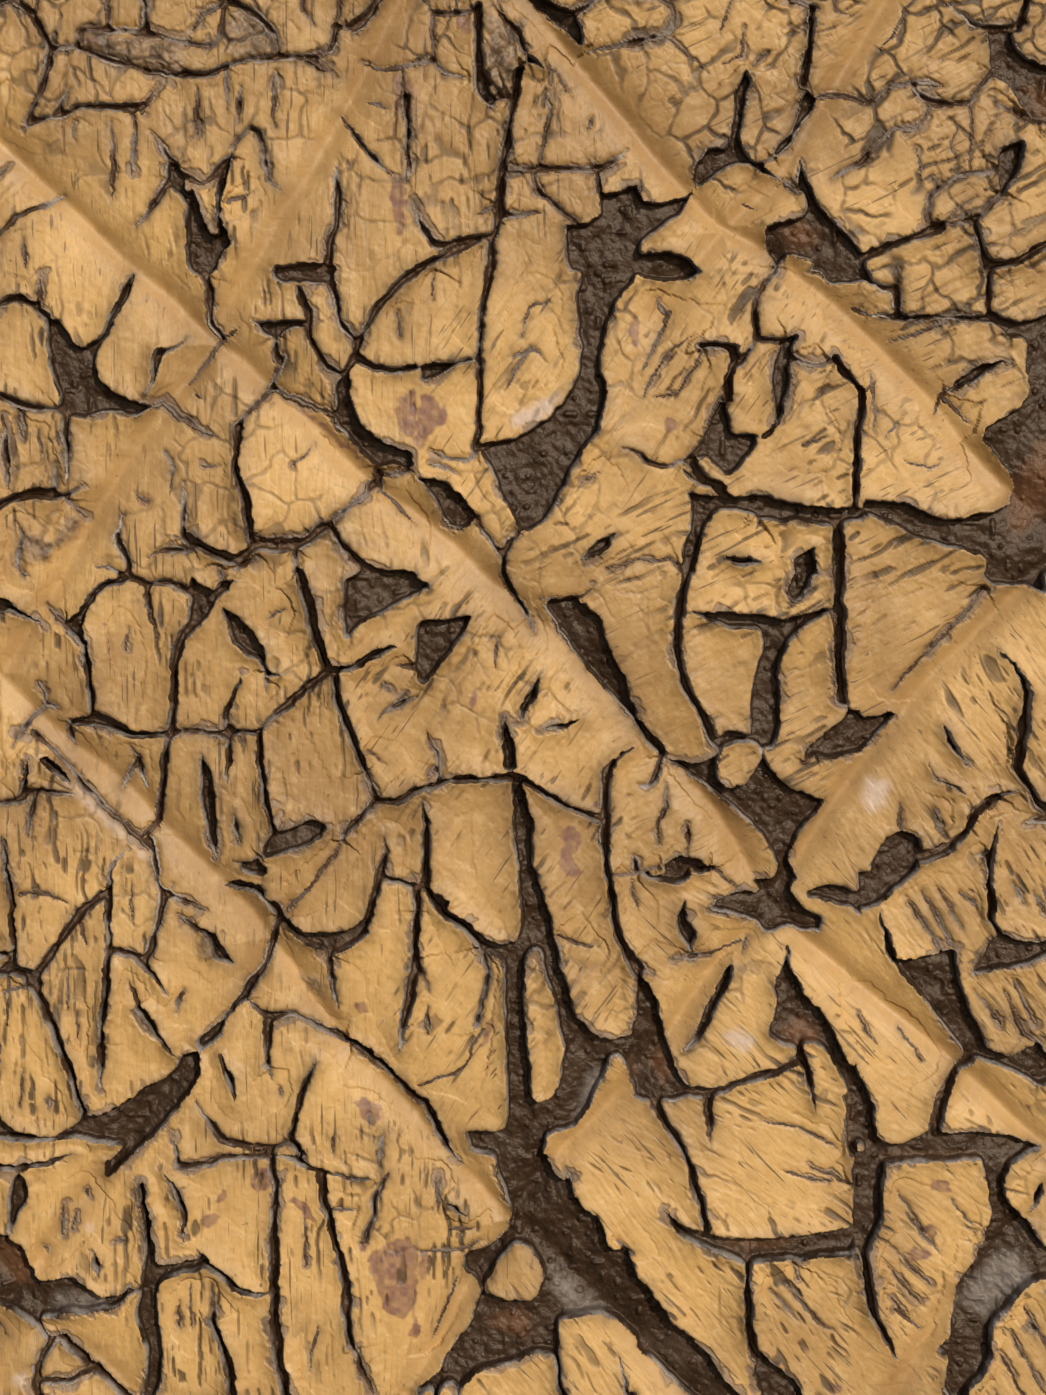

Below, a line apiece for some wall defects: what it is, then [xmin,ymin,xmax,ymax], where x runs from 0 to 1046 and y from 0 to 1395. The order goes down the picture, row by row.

peeling [45,273,155,419]
peeling [238,0,1046,932]
crack [642,266,970,707]
corrosion [0,1234,38,1291]
crack [0,0,766,1395]
peeling [0,570,1046,1395]
corrosion [644,1041,680,1095]
corrosion [713,1235,807,1255]
corrosion [777,1012,824,1055]
crack [626,1009,981,1363]
crack [879,651,1046,1049]
crack [994,1305,1046,1395]